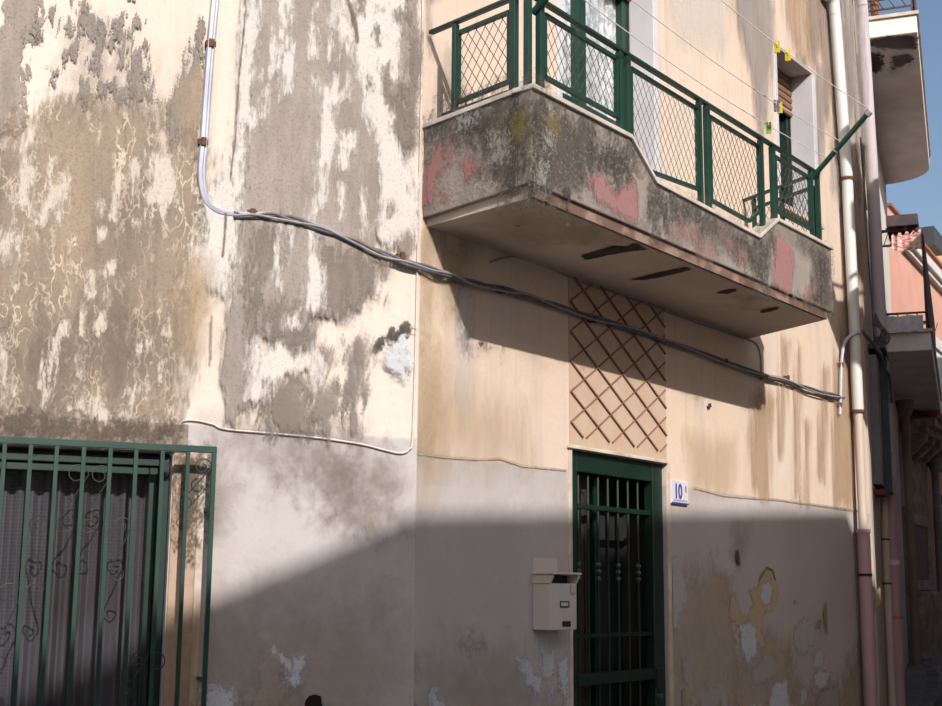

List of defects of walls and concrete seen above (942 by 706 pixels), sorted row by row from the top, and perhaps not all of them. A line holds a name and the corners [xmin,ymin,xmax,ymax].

peeling [0,147,73,284]
peeling [0,0,207,243]
flaking render [188,0,480,443]
leakage [366,67,641,217]
leakage [647,181,777,294]
leakage [737,0,774,135]
leakage [787,0,919,318]
peeling [37,259,117,411]
leakage [0,93,211,565]
peeling [67,354,168,424]
leakage [751,327,855,507]
spalling [305,694,322,706]